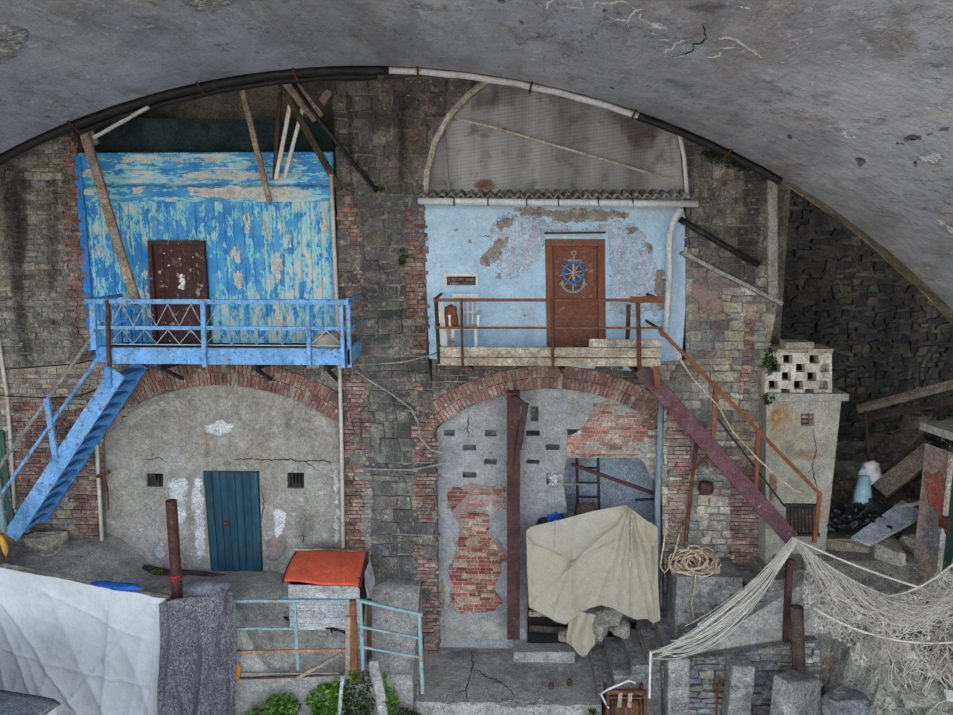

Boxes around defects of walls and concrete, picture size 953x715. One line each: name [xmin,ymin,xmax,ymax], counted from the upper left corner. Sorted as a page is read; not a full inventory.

crack [546,0,761,58]
peeling [114,157,153,195]
peeling [165,156,310,200]
peeling [242,213,268,239]
peeling [230,246,244,290]
peeling [271,232,292,284]
peeling [480,206,666,336]
crack [232,458,333,471]
flaking render [566,401,657,478]
peeling [920,470,946,558]
flaking render [440,484,507,643]
crack [455,655,514,701]